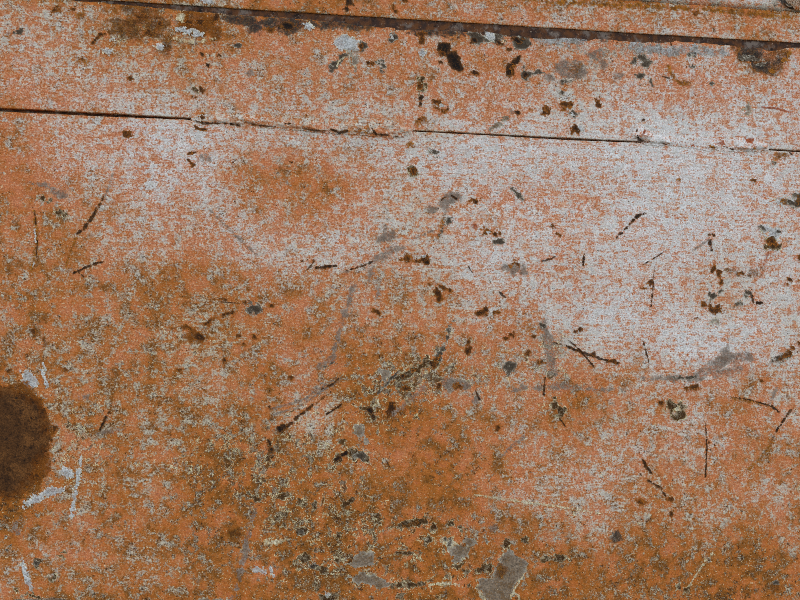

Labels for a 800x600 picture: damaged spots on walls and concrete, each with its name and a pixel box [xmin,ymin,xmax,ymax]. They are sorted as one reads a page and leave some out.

corrosion [50,5,84,19]
corrosion [730,46,792,76]
corrosion [384,401,396,419]
corrosion [0,380,58,505]
peeling [276,492,319,512]
peeling [292,510,529,600]
corrosion [540,553,573,564]
peeling [13,558,43,600]